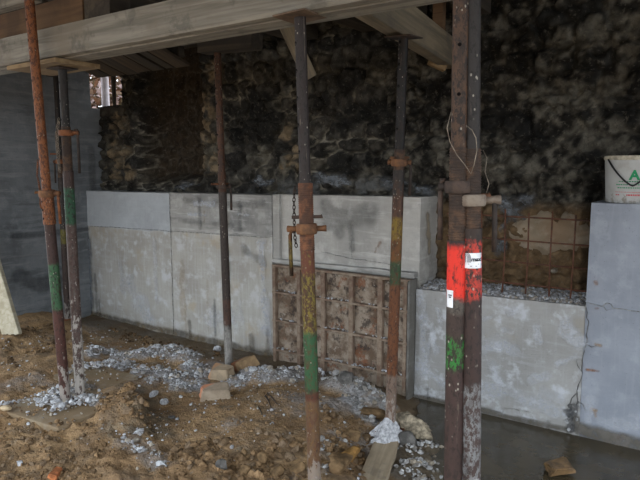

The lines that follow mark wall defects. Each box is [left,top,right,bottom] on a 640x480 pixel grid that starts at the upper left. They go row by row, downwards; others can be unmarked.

spalling [481,209,590,298]
crack [564,302,640,423]